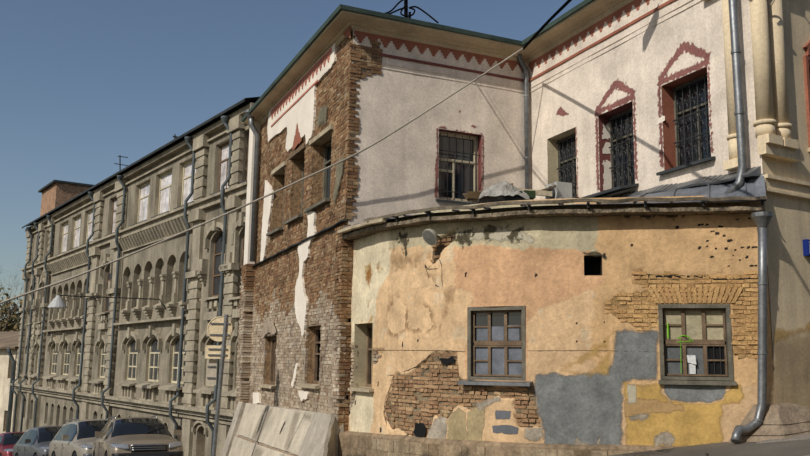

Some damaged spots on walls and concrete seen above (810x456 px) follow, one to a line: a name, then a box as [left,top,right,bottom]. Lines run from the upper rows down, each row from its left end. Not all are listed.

spalling [345,40,383,221]
peeling [602,123,612,190]
damp [396,228,409,256]
damp [453,224,497,247]
peeling [430,226,534,264]
damp [507,227,524,243]
spalling [604,223,758,359]
spalling [380,353,543,441]